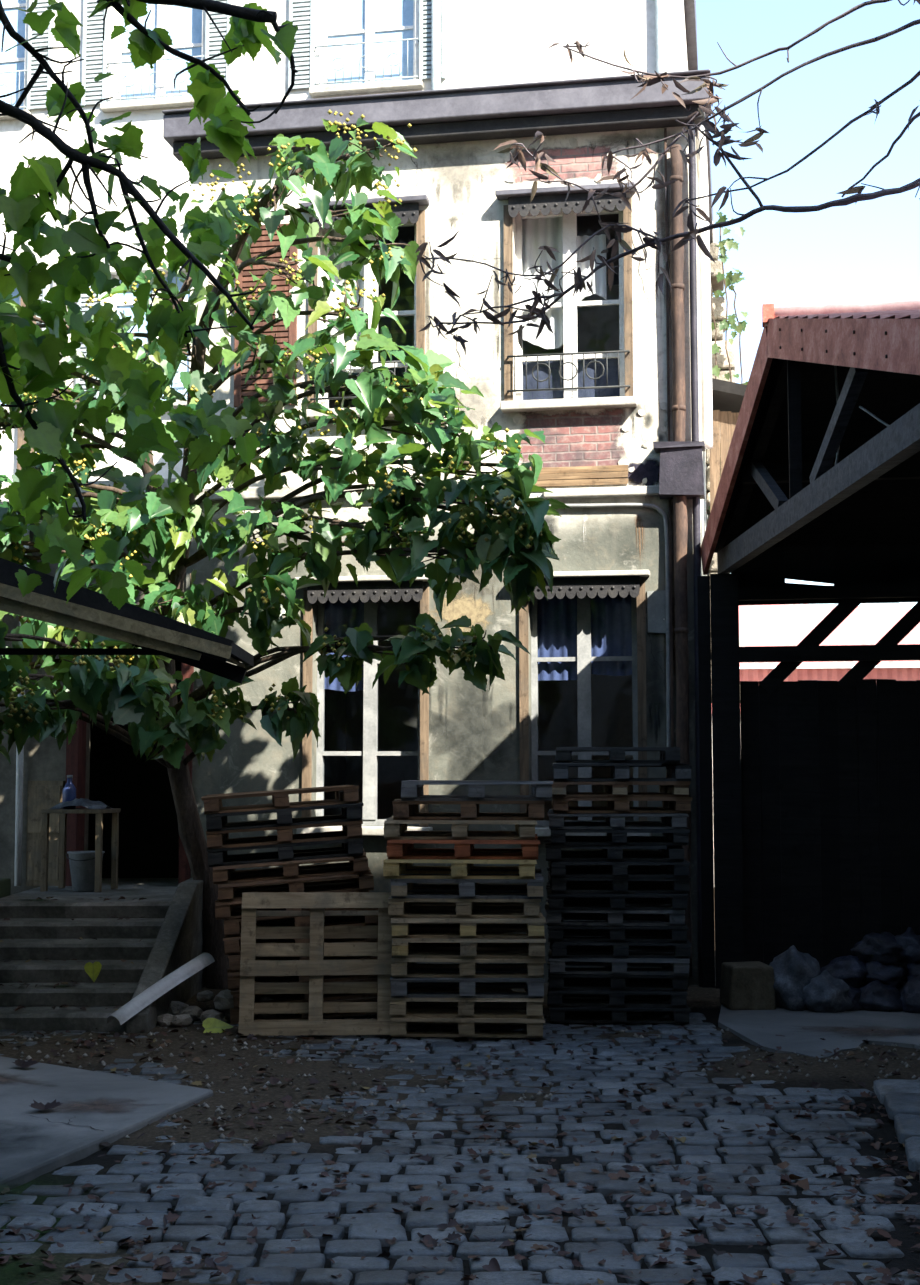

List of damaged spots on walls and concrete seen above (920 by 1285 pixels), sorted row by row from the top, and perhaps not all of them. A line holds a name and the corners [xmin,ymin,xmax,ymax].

water stain [430,153,492,200]
spalling [502,138,618,183]
spalling [513,398,668,483]